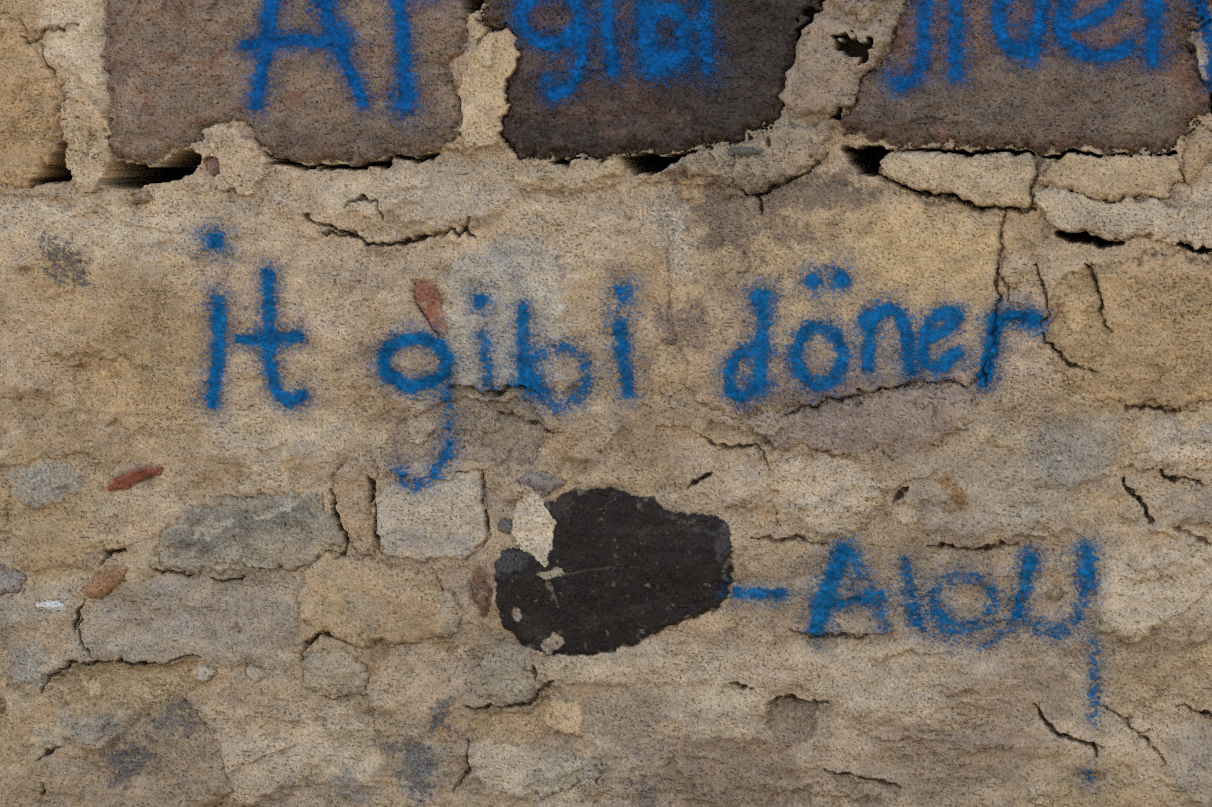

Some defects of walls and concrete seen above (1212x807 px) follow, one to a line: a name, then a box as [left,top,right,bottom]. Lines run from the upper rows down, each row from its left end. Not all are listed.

crack [1039,708,1097,755]